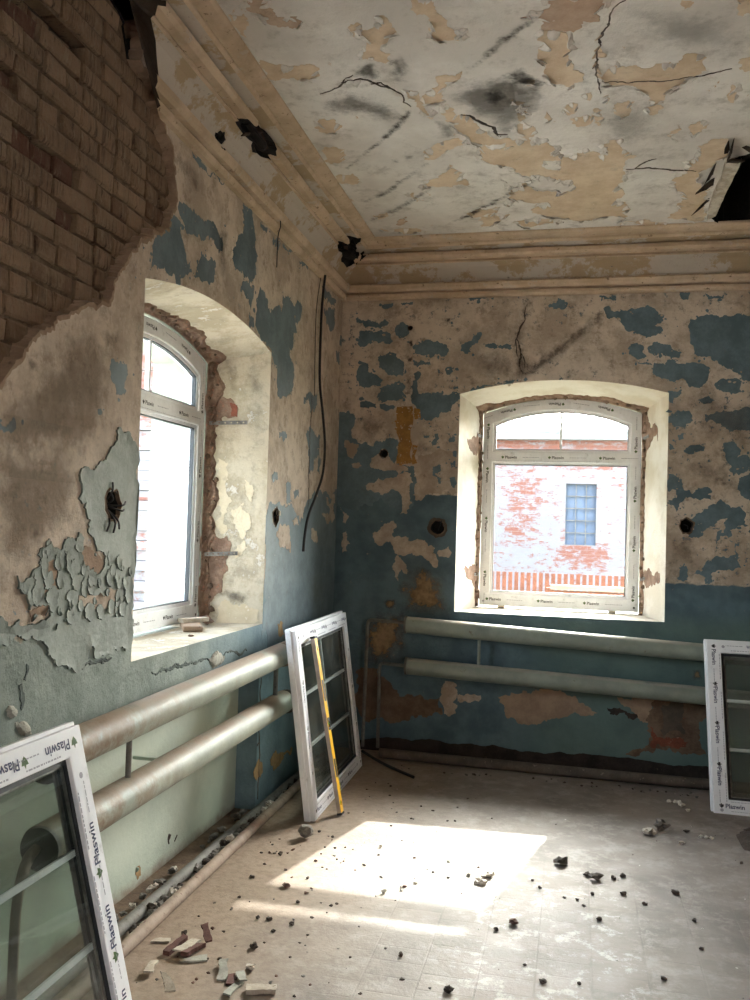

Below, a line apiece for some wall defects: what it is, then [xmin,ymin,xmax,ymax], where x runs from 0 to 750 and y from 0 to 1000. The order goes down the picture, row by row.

crack [320,75,411,107]
crack [461,114,508,137]
leakage [512,72,536,85]
peeling [401,71,734,229]
peeling [520,0,707,127]
crack [592,0,732,94]
spalling [0,0,303,402]
crack [515,305,527,374]
peeling [144,286,750,647]
peeling [0,427,140,673]
spalling [355,667,481,724]
spalling [607,697,706,757]